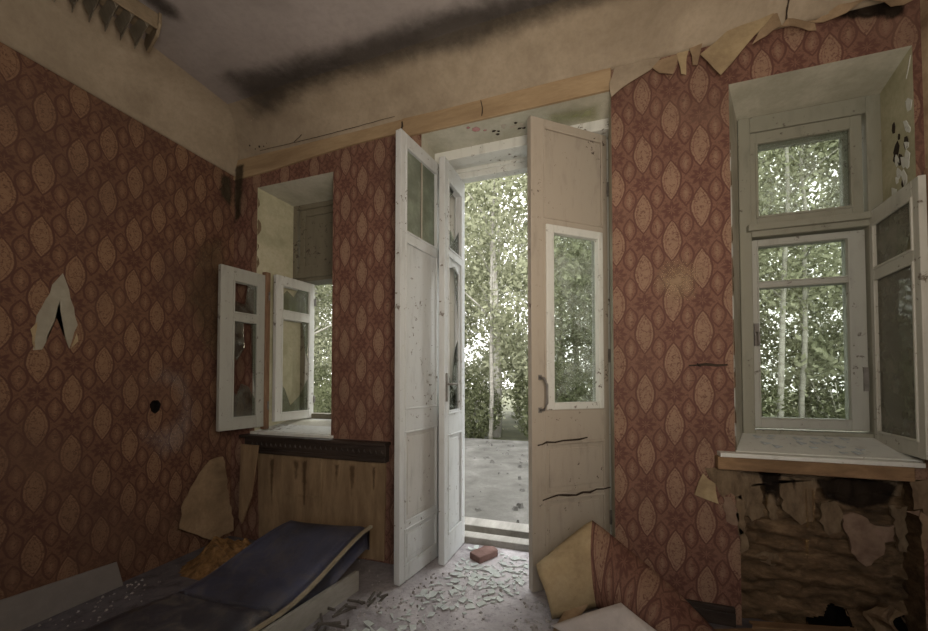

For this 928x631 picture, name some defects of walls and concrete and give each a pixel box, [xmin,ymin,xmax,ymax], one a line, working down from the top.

leakage [233,0,591,108]
peeling [609,43,702,97]
peeling [753,0,913,44]
peeling [30,273,78,350]
spalling [705,467,928,631]